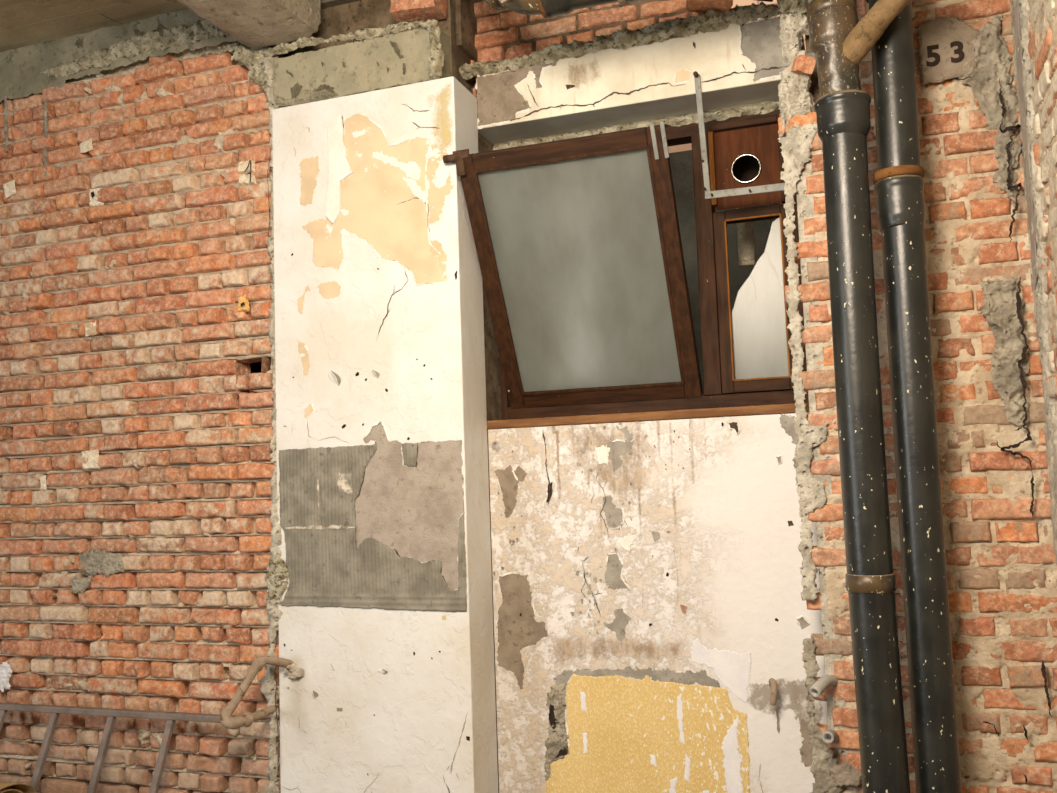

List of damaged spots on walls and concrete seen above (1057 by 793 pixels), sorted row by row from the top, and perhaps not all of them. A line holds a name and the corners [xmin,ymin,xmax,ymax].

crack [496,63,788,123]
crack [961,75,1023,242]
crack [376,272,408,340]
spalling [459,0,828,601]
flaking render [40,19,464,793]
crack [996,277,1035,517]
peeling [493,566,548,689]
peeling [570,495,635,645]
flaking render [544,666,720,780]
flaking render [796,615,843,793]